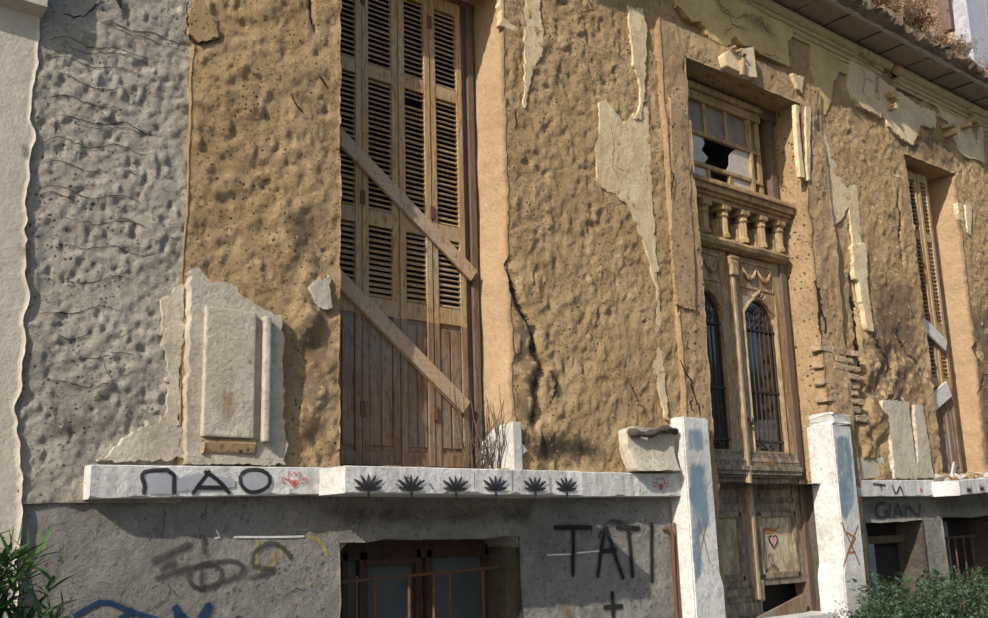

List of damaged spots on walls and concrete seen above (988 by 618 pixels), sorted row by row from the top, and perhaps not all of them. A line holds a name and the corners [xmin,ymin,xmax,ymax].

crack [66,0,102,18]
crack [718,0,776,36]
spalling [893,135,950,165]
crack [505,265,558,423]
spalling [810,283,921,424]